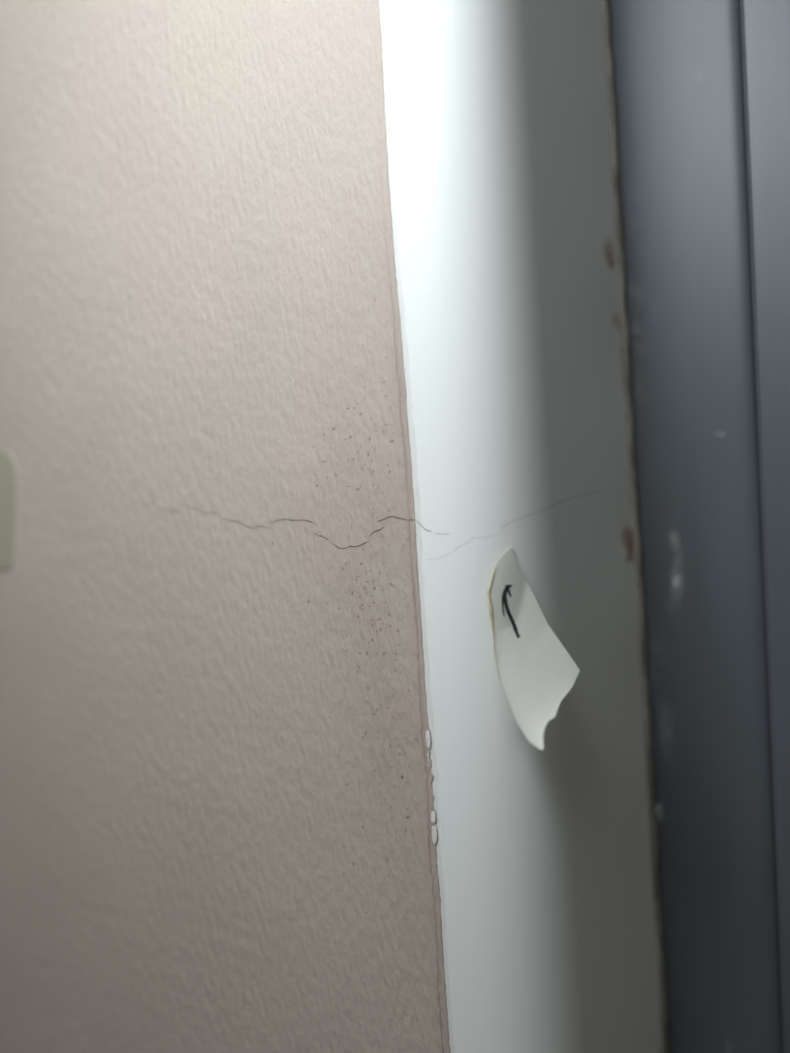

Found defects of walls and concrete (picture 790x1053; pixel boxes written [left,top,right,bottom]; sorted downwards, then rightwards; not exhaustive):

crack [190,507,443,549]